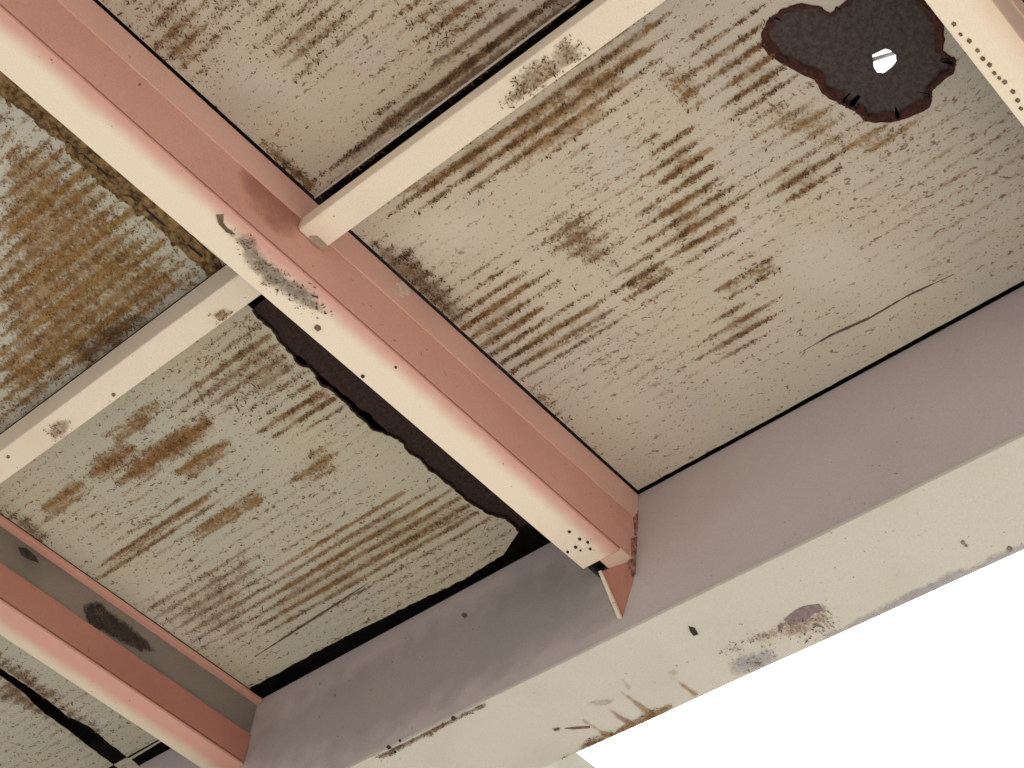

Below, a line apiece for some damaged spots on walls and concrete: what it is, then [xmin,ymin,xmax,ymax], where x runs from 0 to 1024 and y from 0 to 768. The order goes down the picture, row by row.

rust [117,0,380,114]
rust [249,0,581,199]
rust [0,71,223,431]
rust [362,4,914,449]
crack [804,274,954,351]
rust [1,311,351,544]
rust [84,602,152,653]
rust [87,487,267,581]
rust [142,478,491,654]